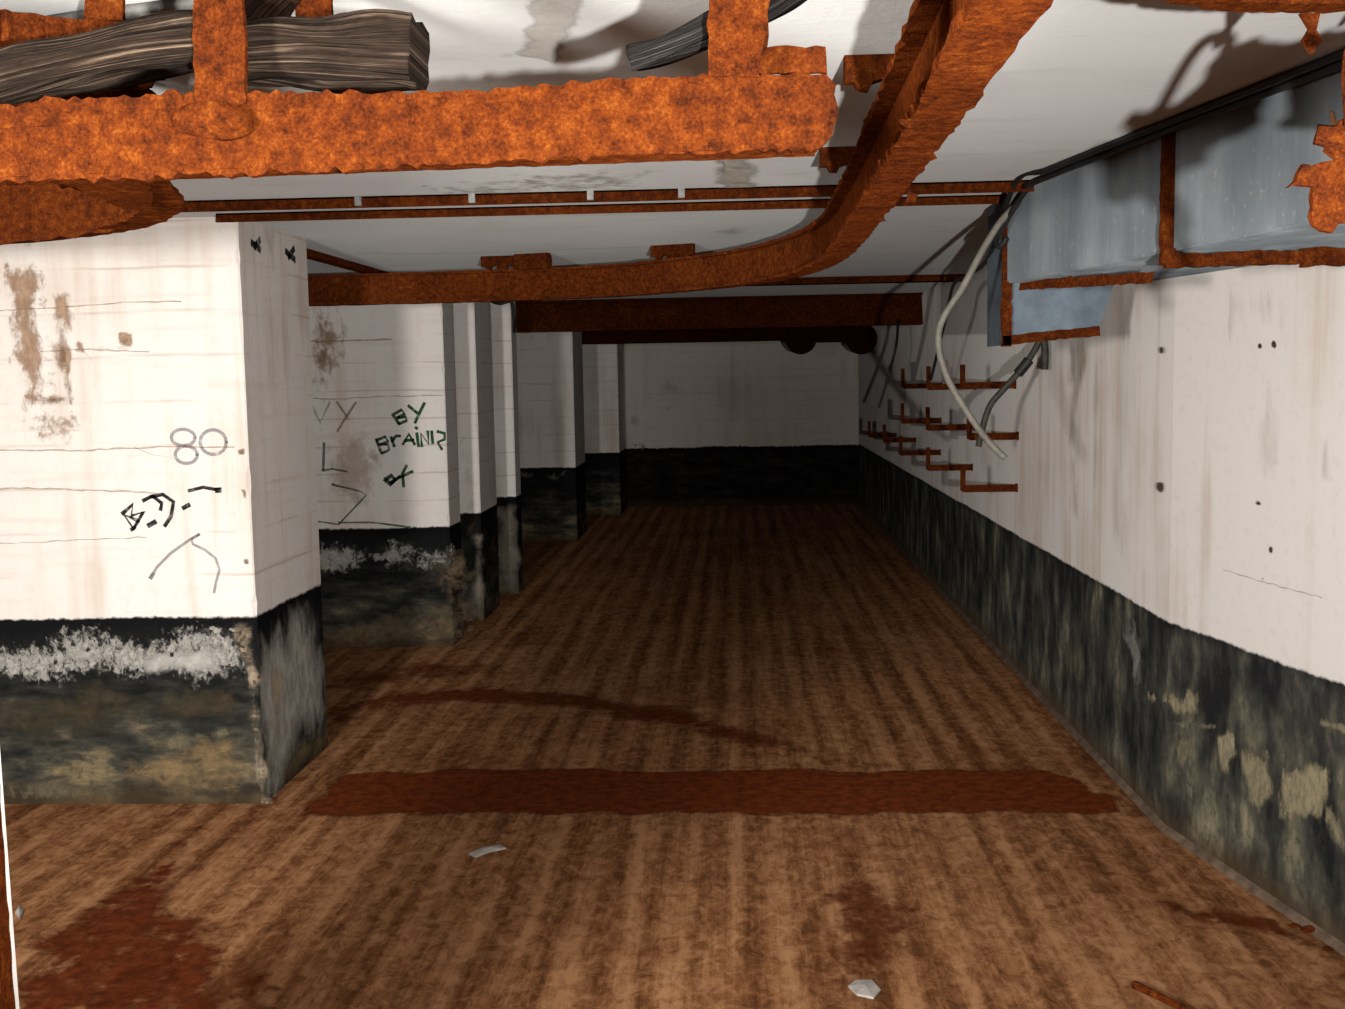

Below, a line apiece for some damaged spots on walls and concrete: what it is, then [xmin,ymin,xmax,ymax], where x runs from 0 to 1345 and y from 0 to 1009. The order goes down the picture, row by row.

water stain [717,159,757,188]
water stain [1126,625,1141,683]